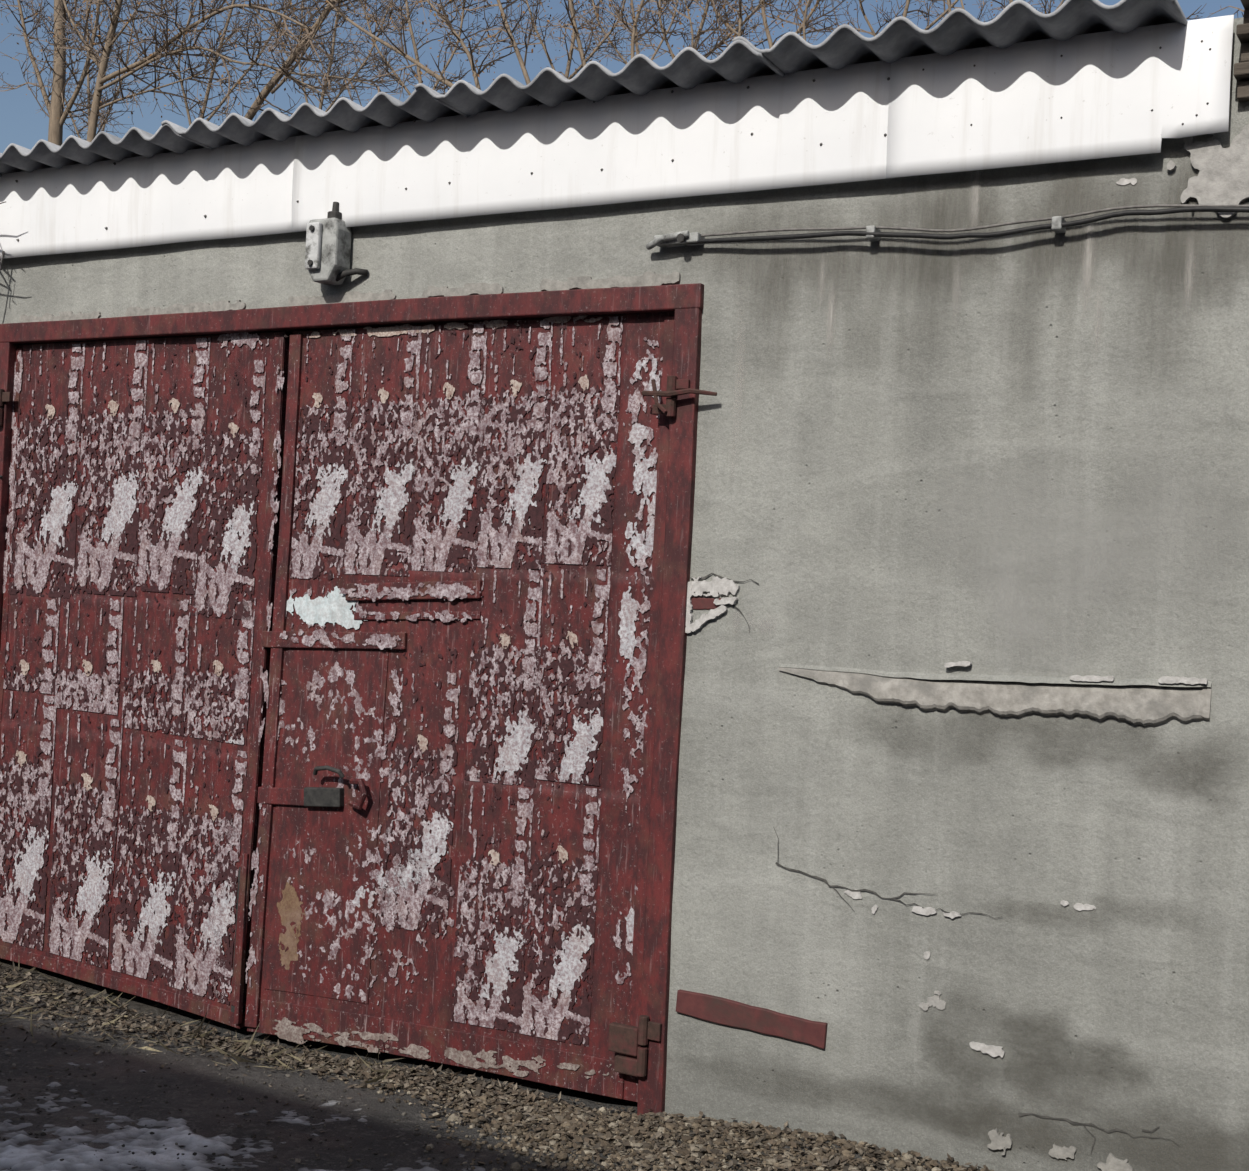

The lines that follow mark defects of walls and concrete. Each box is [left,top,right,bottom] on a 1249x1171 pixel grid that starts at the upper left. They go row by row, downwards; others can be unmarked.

leakage [1033,177,1139,286]
leakage [1165,173,1202,285]
spalling [685,576,740,633]
peeling [0,315,663,1046]
spalling [1158,676,1208,685]
crack [774,828,1002,919]
peeling [273,1017,620,1082]
leakage [947,1104,1064,1151]